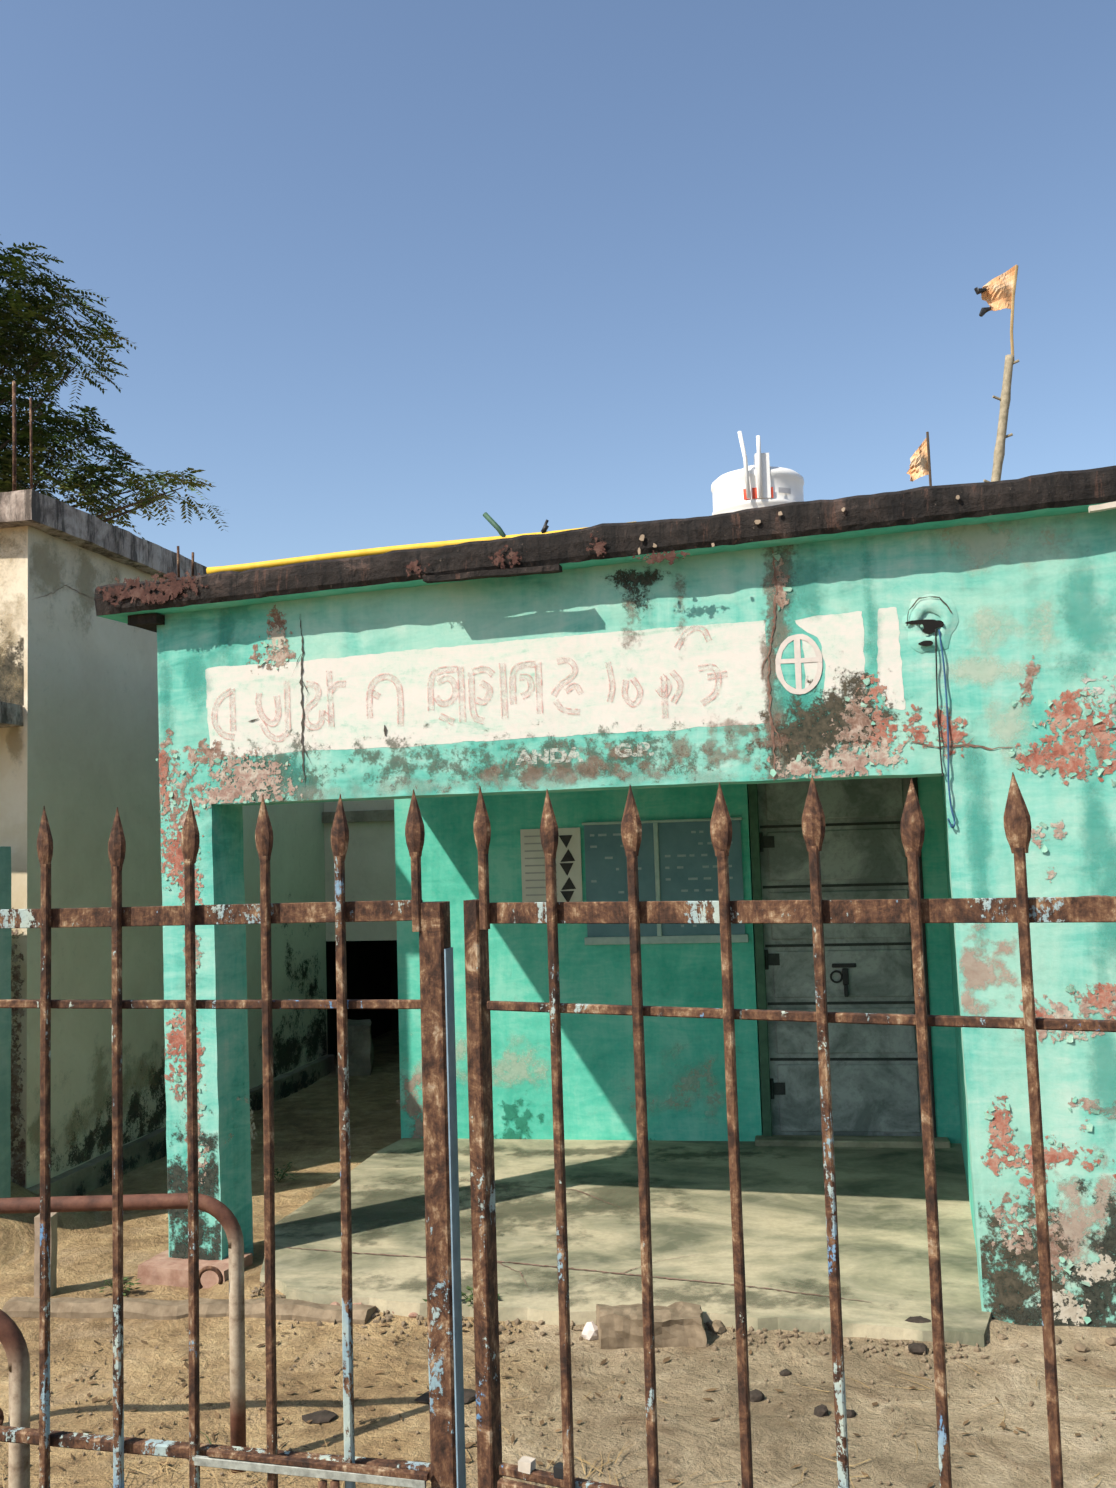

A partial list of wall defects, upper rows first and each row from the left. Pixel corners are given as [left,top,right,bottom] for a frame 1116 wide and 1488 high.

damp [0,623,24,705]
crack [296,620,312,785]
damp [605,569,683,645]
corrosion [761,545,796,779]
peeling [766,671,969,780]
peeling [1007,655,1116,787]
peeling [156,728,303,905]
damp [250,923,330,1111]
peeling [1019,982,1116,1044]
damp [51,1057,221,1260]
damp [978,1163,1116,1328]
peeling [981,1094,1116,1326]